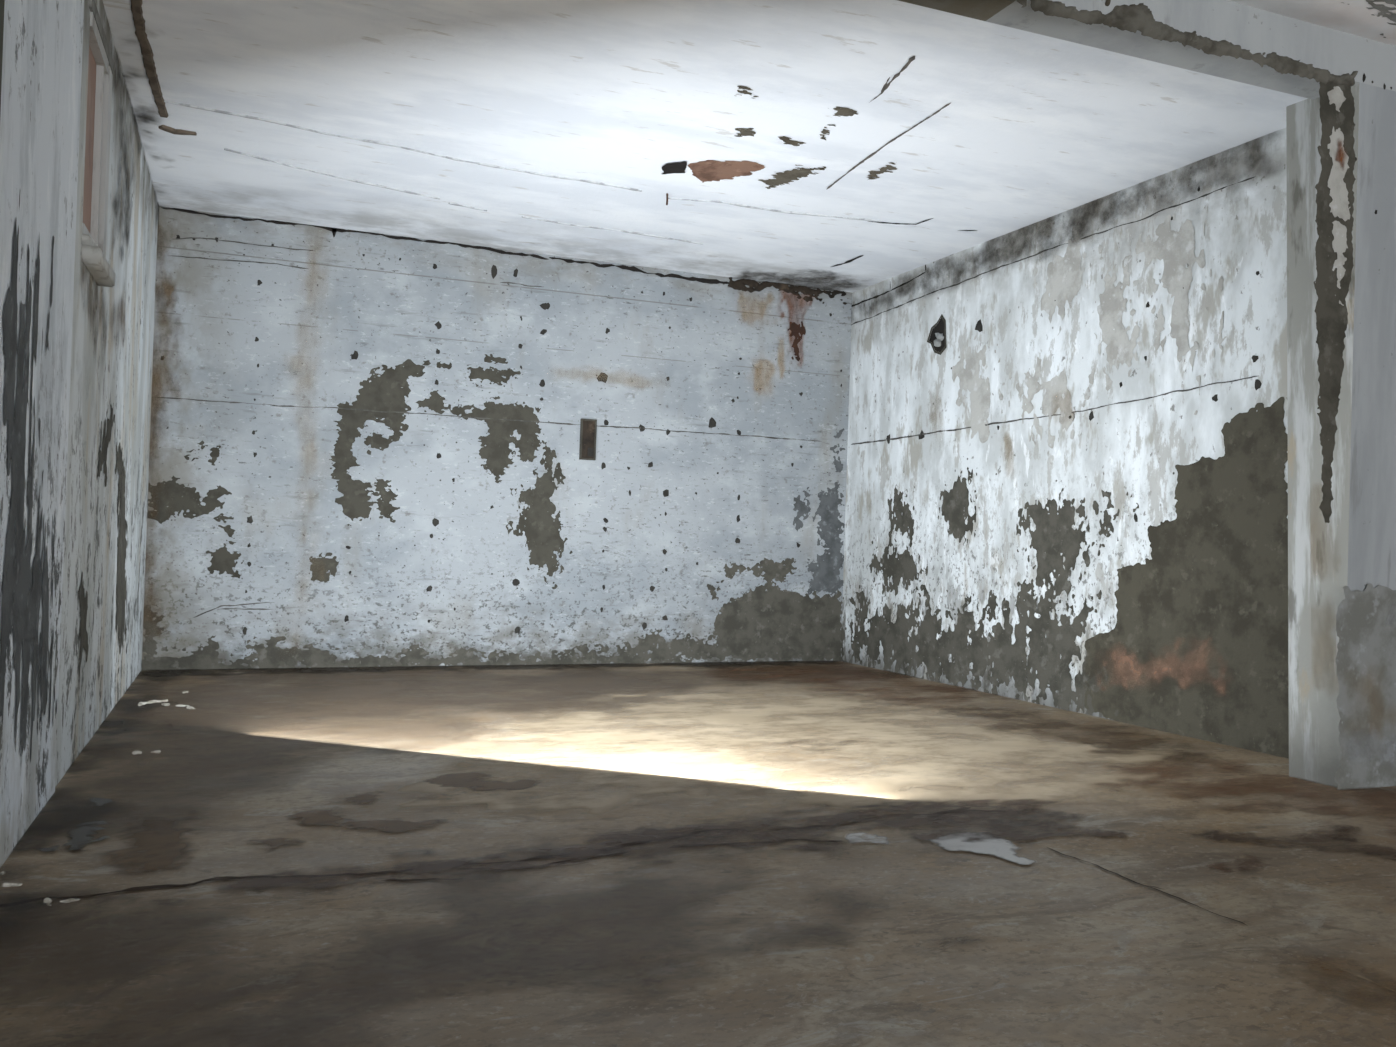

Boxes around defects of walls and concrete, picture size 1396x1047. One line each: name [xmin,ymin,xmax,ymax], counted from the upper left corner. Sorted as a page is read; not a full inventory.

damp [115,106,156,253]
peeling [758,165,826,189]
peeling [779,106,858,146]
spalling [728,277,847,317]
rust [781,293,812,361]
peeling [927,187,1226,455]
peeling [1006,0,1396,523]
peeling [97,349,1289,759]
peeling [1334,583,1396,790]
damp [14,660,1204,872]
crack [0,807,1038,905]
damp [312,874,723,1000]